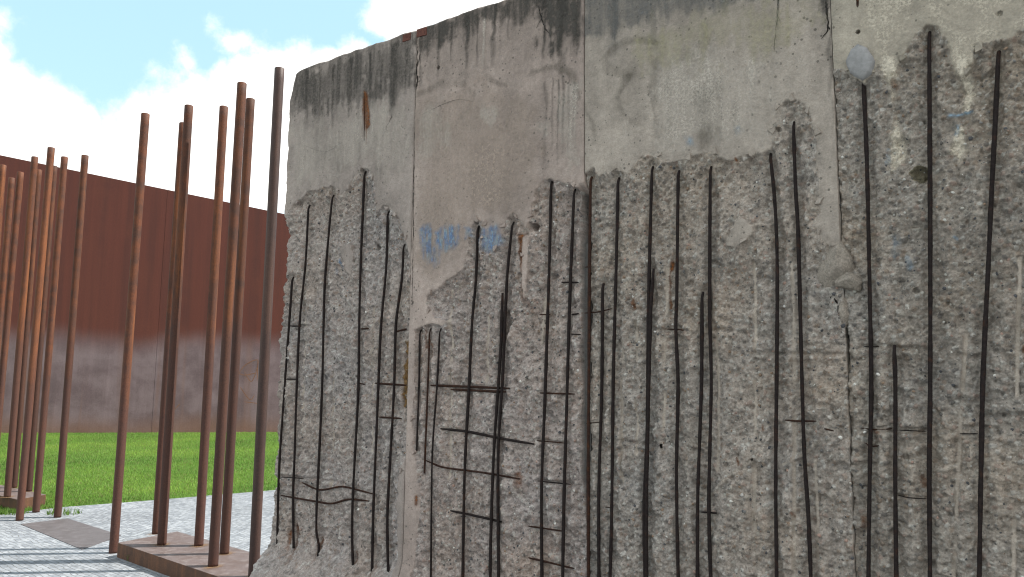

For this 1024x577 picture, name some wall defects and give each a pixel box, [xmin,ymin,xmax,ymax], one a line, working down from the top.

water stain [293,0,726,131]
spalling [249,24,1024,577]